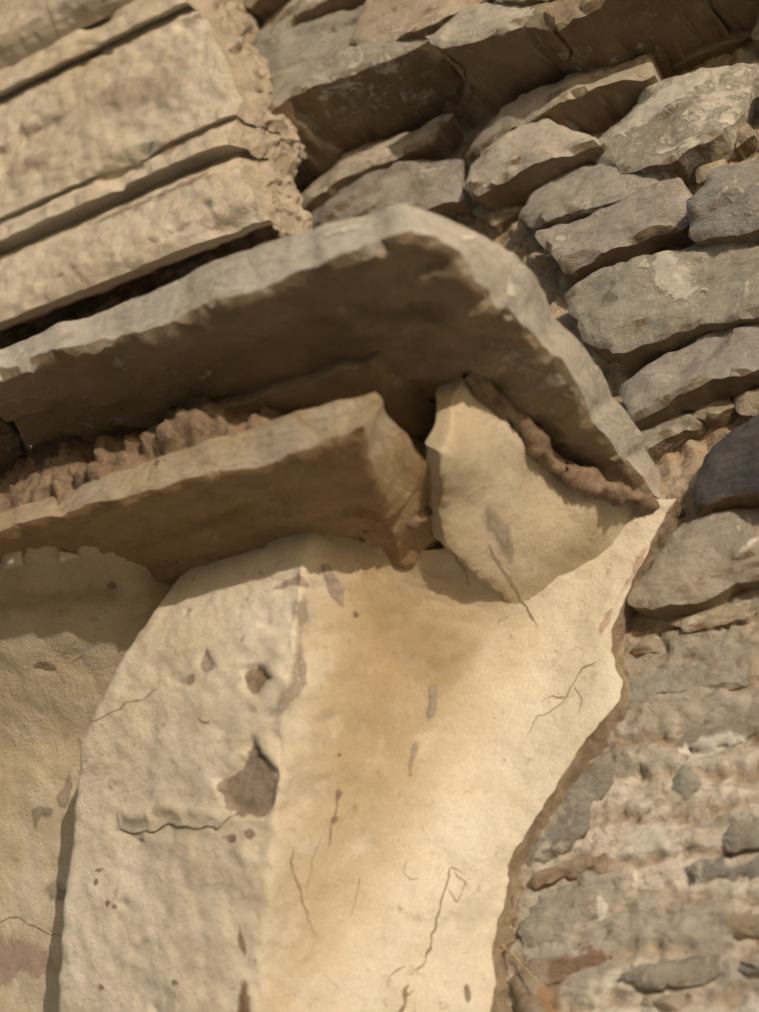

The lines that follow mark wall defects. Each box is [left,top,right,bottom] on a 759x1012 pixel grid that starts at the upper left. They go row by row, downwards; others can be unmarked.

crack [488,544,537,624]
crack [527,661,597,735]
spalling [218,746,280,818]
spalling [228,829,255,842]
crack [389,867,467,1012]